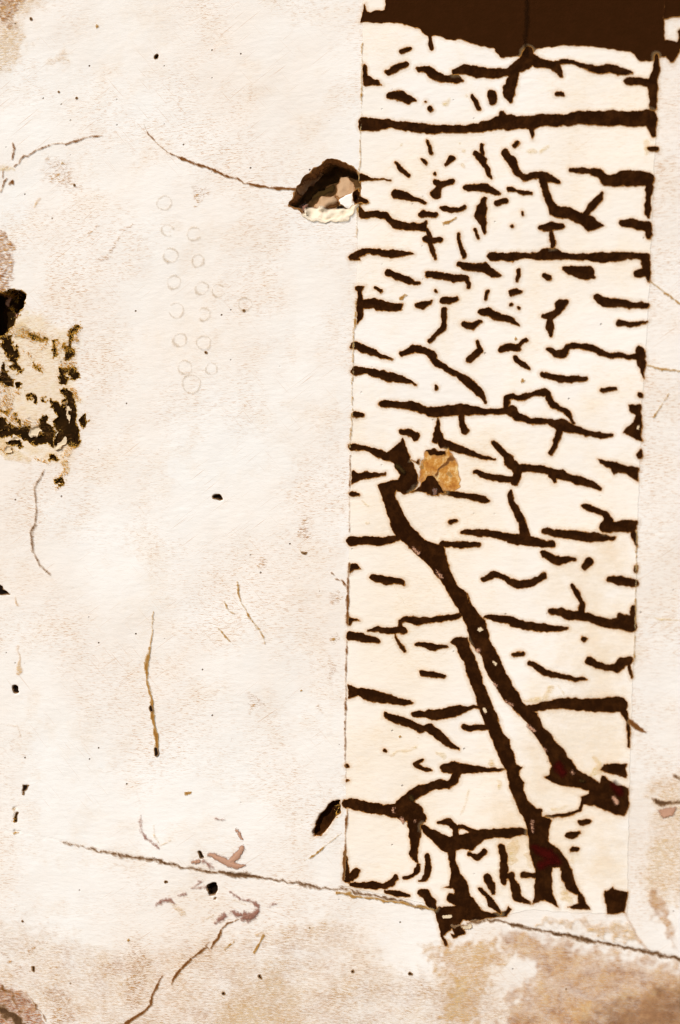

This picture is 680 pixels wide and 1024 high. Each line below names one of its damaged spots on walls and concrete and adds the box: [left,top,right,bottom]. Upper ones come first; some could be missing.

crack [147,132,297,191]
spalling [0,288,89,462]
crack [349,302,357,487]
peeling [288,0,680,946]
crack [331,562,350,777]
crack [63,812,680,962]
damp [419,933,680,1024]